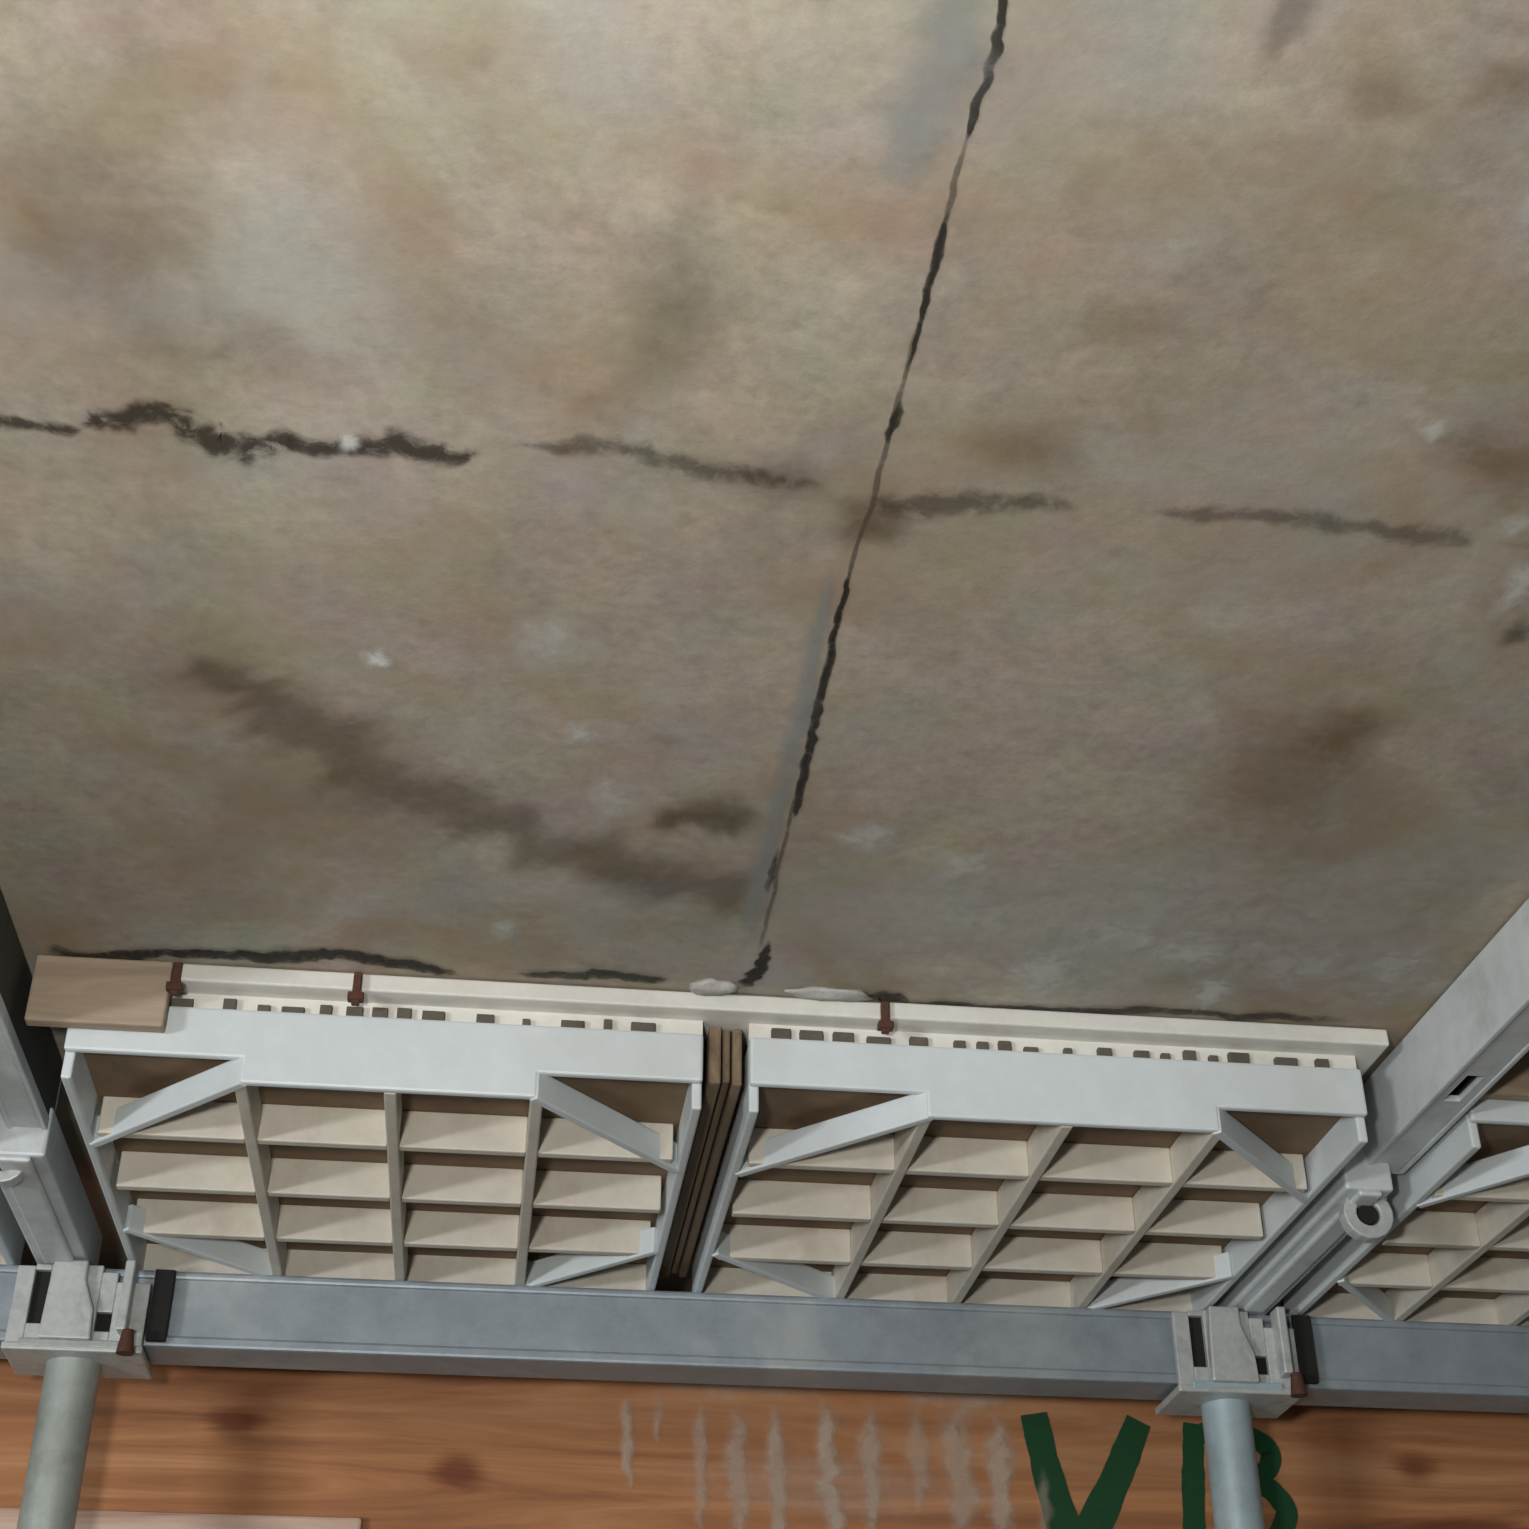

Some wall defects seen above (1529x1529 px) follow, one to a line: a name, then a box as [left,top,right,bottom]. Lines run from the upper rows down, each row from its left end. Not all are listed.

crack [967,0,1007,137]
crack [909,222,947,363]
crack [0,402,474,465]
crack [885,406,903,440]
crack [793,579,850,815]
crack [764,856,777,890]
crack [740,944,771,986]
leakage [818,1415,842,1529]
leakage [991,1429,1010,1528]